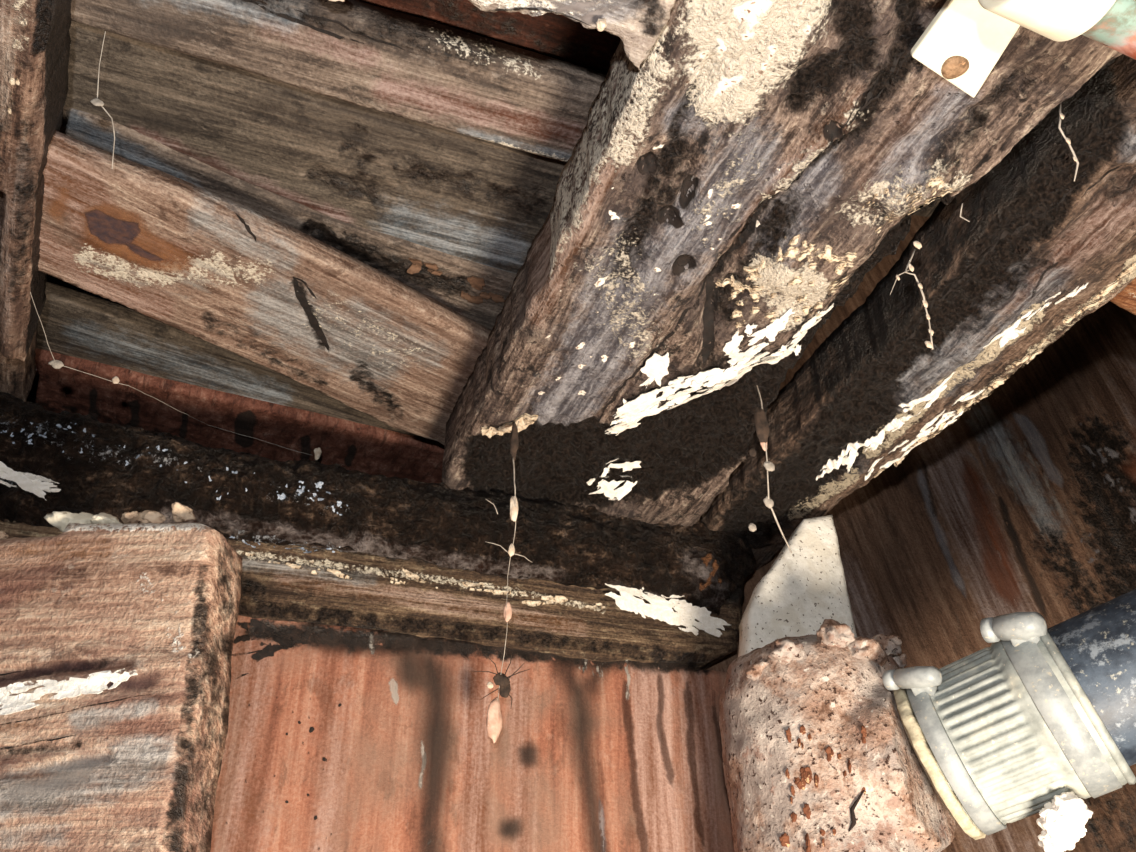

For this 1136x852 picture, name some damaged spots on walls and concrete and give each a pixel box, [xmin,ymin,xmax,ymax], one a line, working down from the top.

leakage [861,172,957,233]
leakage [716,234,857,328]
leakage [983,261,1136,348]
peeling [605,303,834,436]
peeling [749,407,770,457]
leakage [816,339,1047,481]
peeling [0,461,61,500]
leakage [277,481,348,516]
peeling [387,568,438,589]
peeling [462,581,568,622]
peeling [585,583,730,637]
leakage [288,632,682,852]